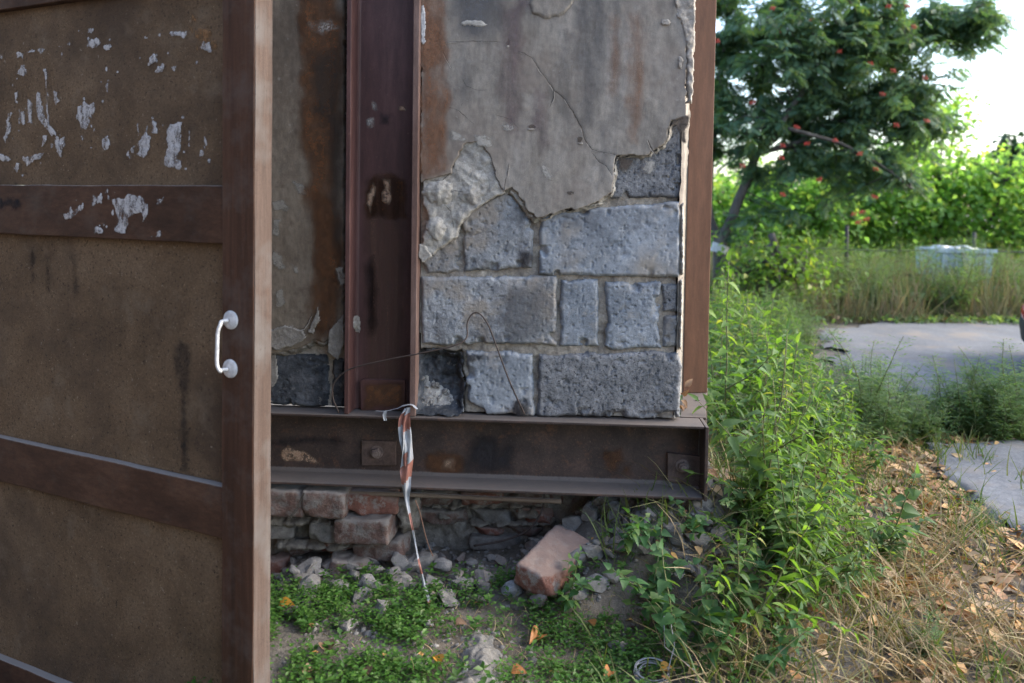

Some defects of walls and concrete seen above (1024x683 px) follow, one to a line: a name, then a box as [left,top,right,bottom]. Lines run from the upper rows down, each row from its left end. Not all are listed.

peeling [0,49,64,177]
peeling [76,67,118,150]
peeling [64,189,161,234]
peeling [126,116,210,170]
rust [300,0,343,333]
crack [445,40,615,173]
flaking render [418,124,676,262]
spalling [677,202,685,350]
spalling [271,308,361,387]
spalling [416,348,466,417]
rust [282,448,316,463]
rust [427,455,463,473]